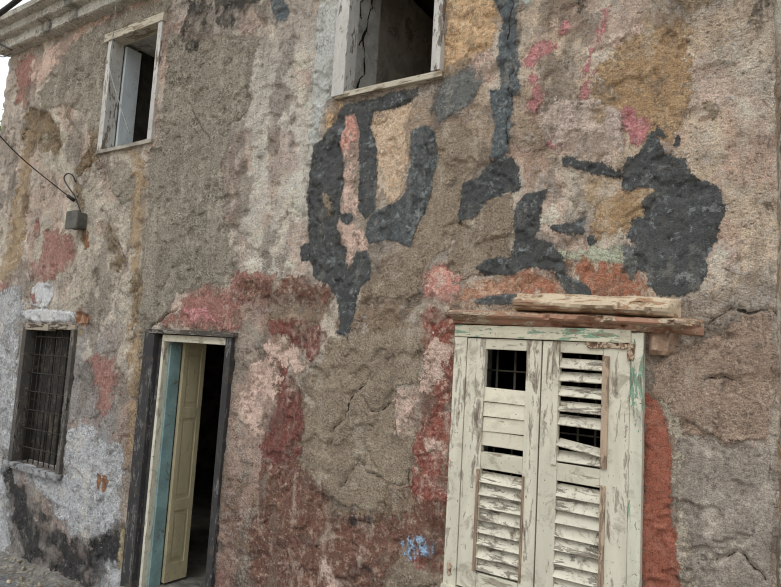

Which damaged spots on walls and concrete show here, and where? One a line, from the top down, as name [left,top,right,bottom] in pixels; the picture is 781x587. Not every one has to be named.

crack [356,0,373,89]
spalling [75,307,91,336]
crack [703,308,776,328]
crack [330,374,391,445]
leakage [117,524,125,570]